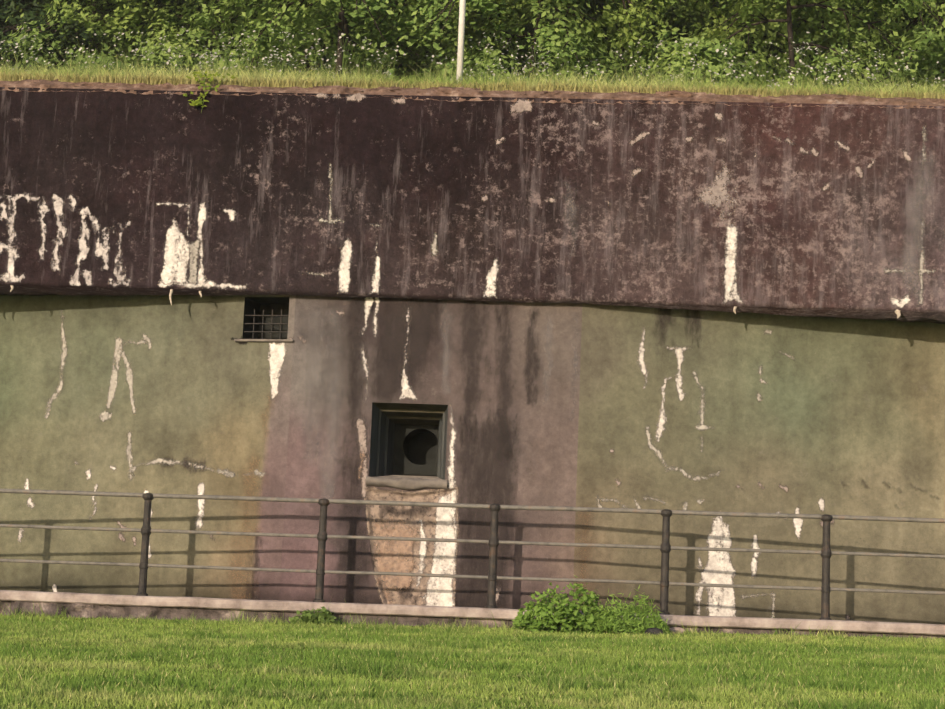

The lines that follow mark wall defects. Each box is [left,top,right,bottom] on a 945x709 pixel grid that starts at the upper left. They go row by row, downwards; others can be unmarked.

water stain [0,193,131,292]
spalling [356,409,459,607]
water stain [458,259,514,606]
water stain [525,312,539,404]